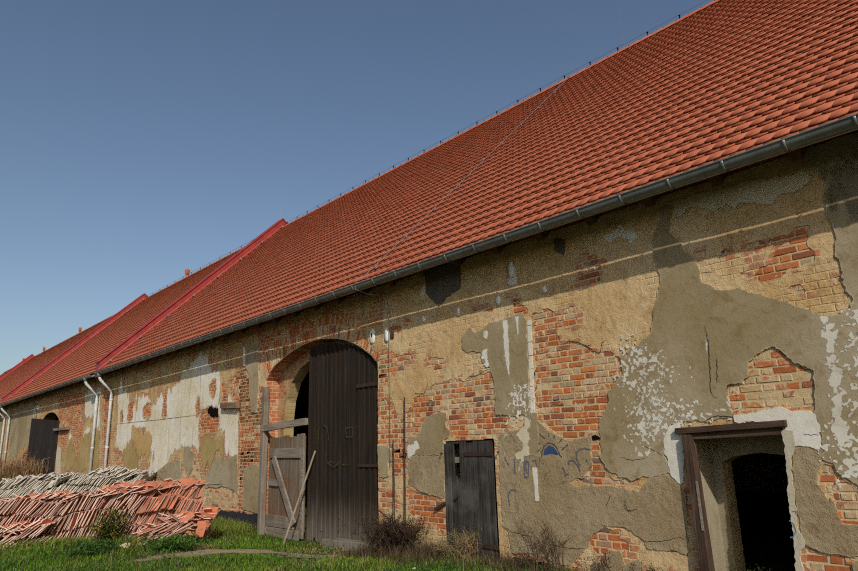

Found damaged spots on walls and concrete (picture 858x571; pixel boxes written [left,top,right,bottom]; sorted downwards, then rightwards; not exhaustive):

flaking render [741,225,815,294]
flaking render [102,386,123,466]
flaking render [121,371,151,422]
flaking render [182,311,413,513]
flaking render [378,299,858,534]
flaking render [590,527,629,561]
flaking render [805,545,853,571]